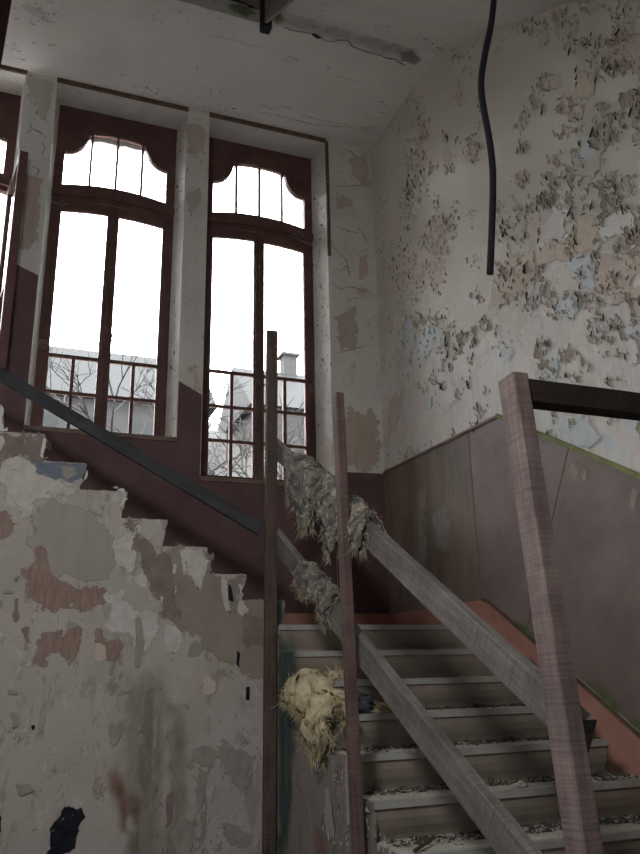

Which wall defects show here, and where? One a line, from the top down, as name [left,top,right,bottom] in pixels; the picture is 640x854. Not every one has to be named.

crack [284,27,405,66]
peeling [312,0,640,473]
peeling [0,516,264,700]
spalling [46,806,85,854]